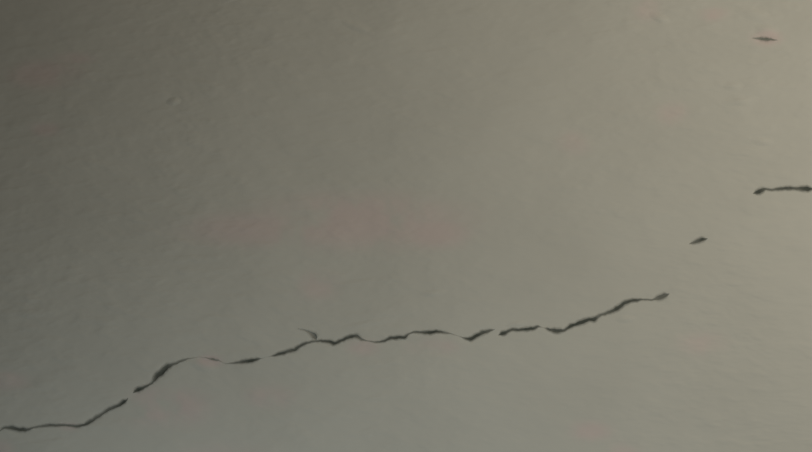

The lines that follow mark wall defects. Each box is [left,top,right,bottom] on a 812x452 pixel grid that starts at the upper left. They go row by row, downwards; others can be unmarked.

crack [753,186,812,194]
crack [0,293,669,431]